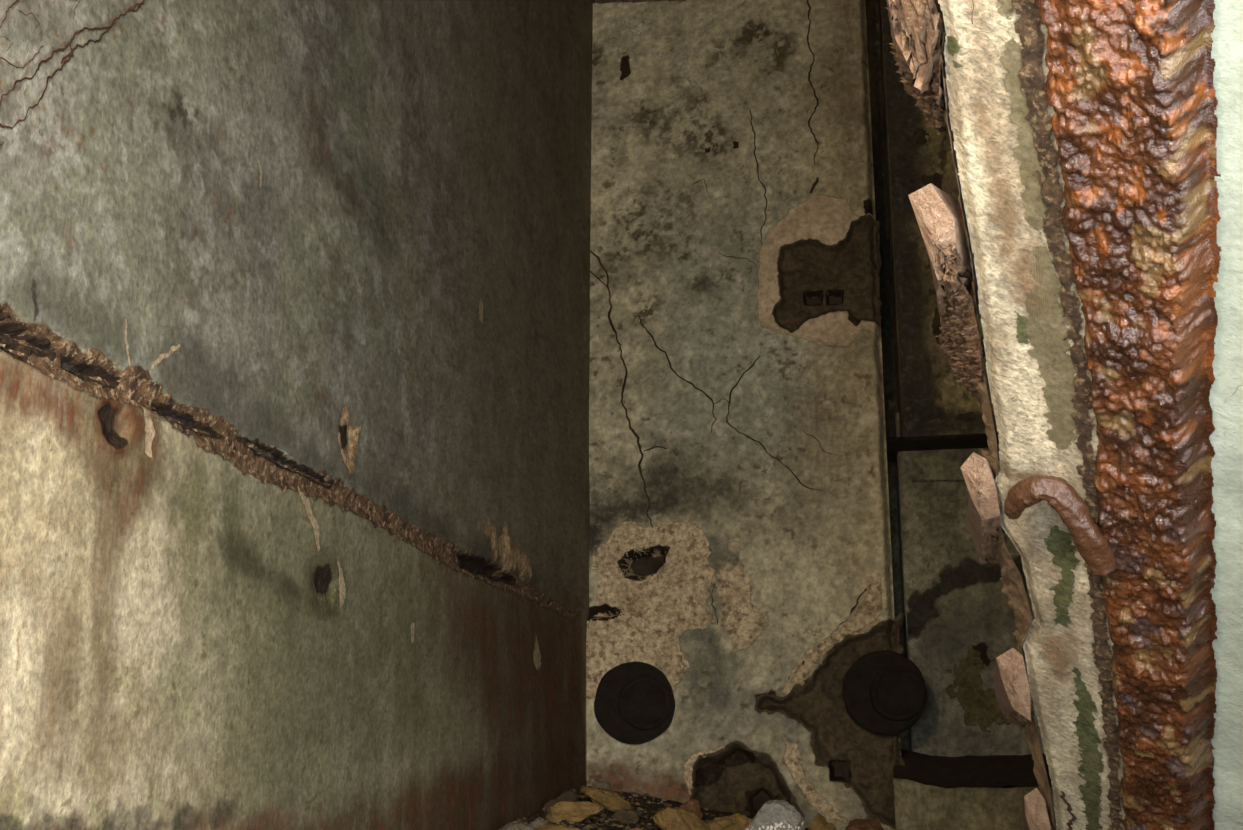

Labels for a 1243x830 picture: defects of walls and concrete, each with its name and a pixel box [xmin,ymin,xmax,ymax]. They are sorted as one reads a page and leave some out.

crack [0,0,144,146]
crack [718,110,767,264]
crack [807,0,819,194]
spalling [757,195,882,347]
peeling [921,173,943,190]
water stain [874,0,998,437]
spalling [0,305,334,551]
crack [590,250,822,527]
spalling [586,521,768,699]
water stain [899,556,1028,638]
peeling [1004,475,1117,577]
spalling [684,572,905,829]